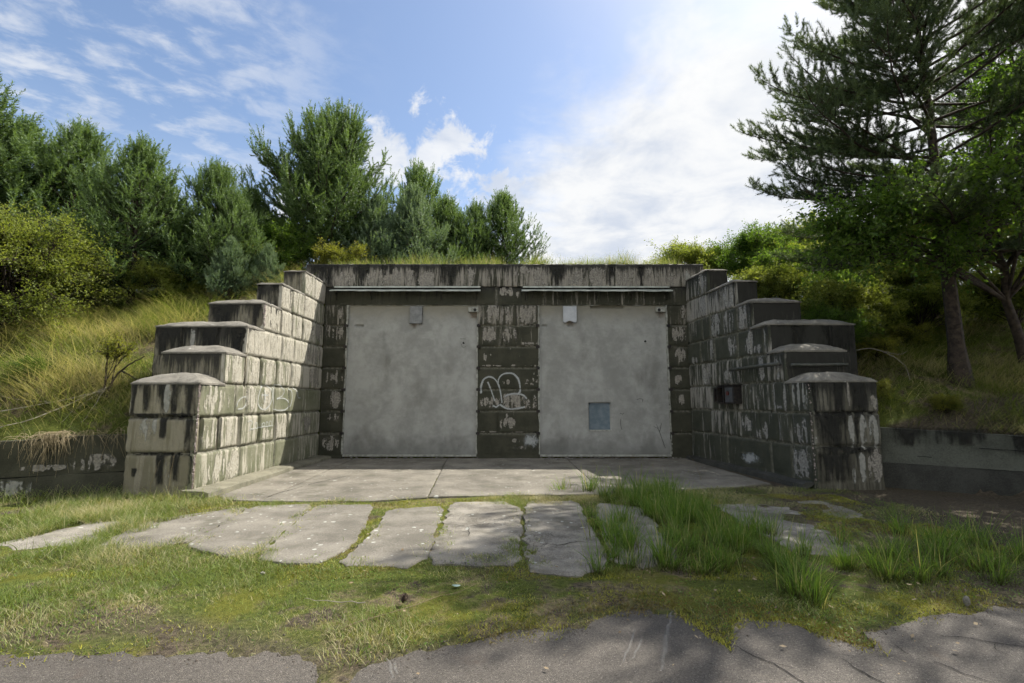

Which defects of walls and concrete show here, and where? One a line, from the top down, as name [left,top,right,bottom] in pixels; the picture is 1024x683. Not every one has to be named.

leakage [312,264,338,286]
leakage [357,264,394,286]
leakage [440,264,459,285]
leakage [549,264,564,285]
peeling [191,276,344,489]
peeling [480,266,540,449]
peeling [672,274,787,441]
peeling [21,454,117,472]
leakage [129,384,197,488]
peeling [794,384,817,481]
leakage [792,382,879,482]
peeling [868,448,883,483]